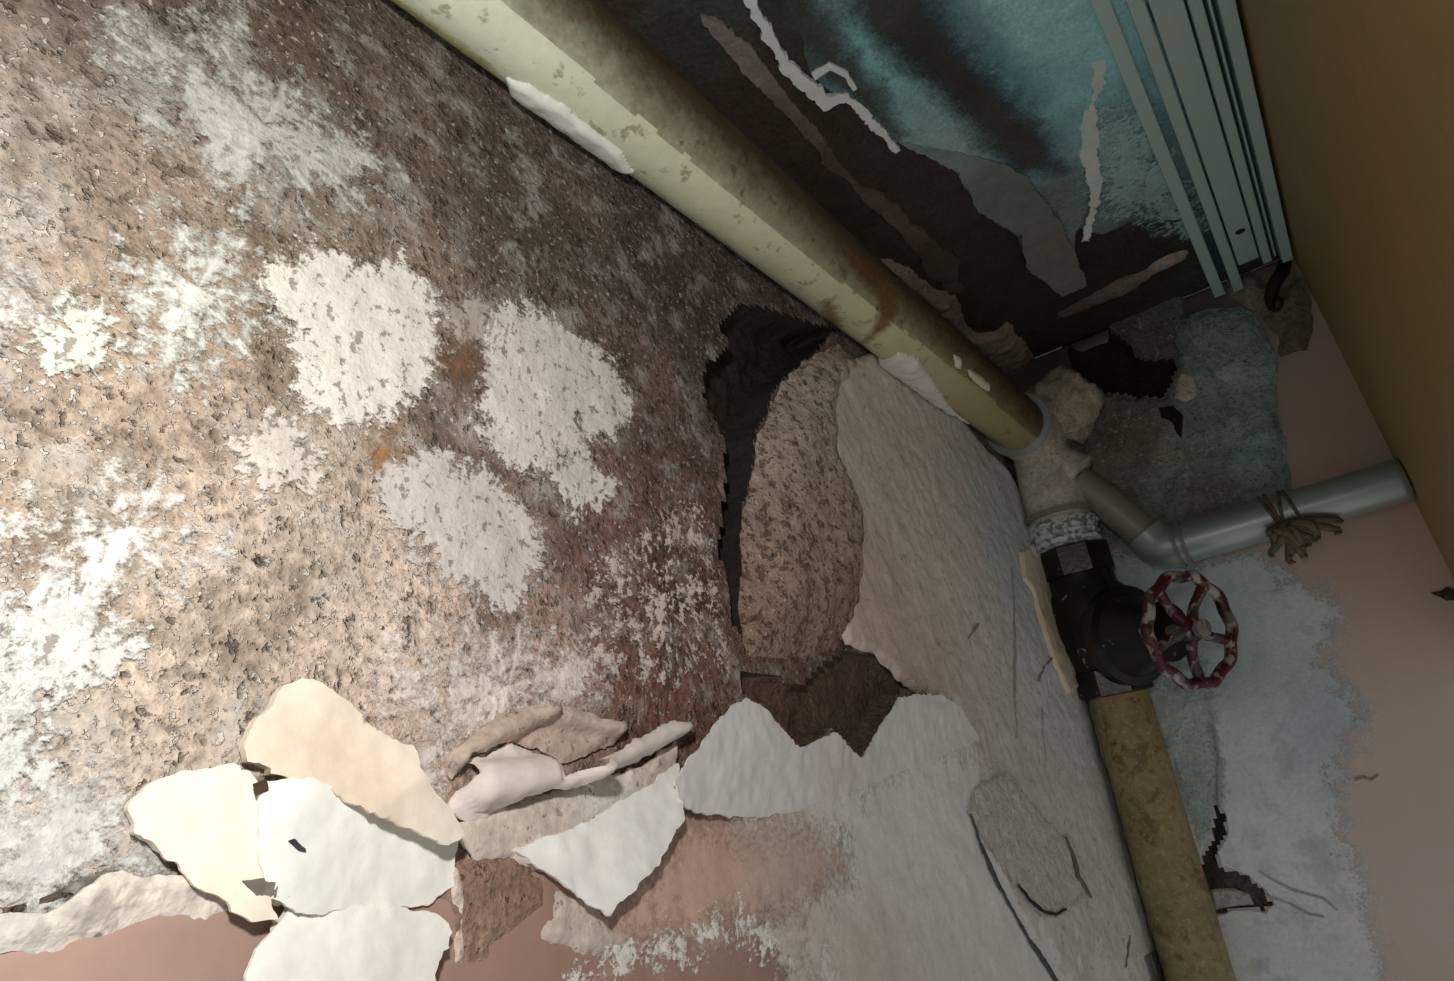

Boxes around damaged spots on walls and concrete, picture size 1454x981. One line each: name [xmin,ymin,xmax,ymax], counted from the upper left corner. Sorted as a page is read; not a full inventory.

peeling [505,77,635,174]
damp [773,0,904,139]
peeling [700,0,1121,297]
damp [851,0,1210,244]
damp [0,4,732,798]
flaking render [1061,328,1177,399]
damp [0,457,236,914]
peeling [0,650,979,981]
crack [970,814,1093,981]
crack [1202,726,1339,918]